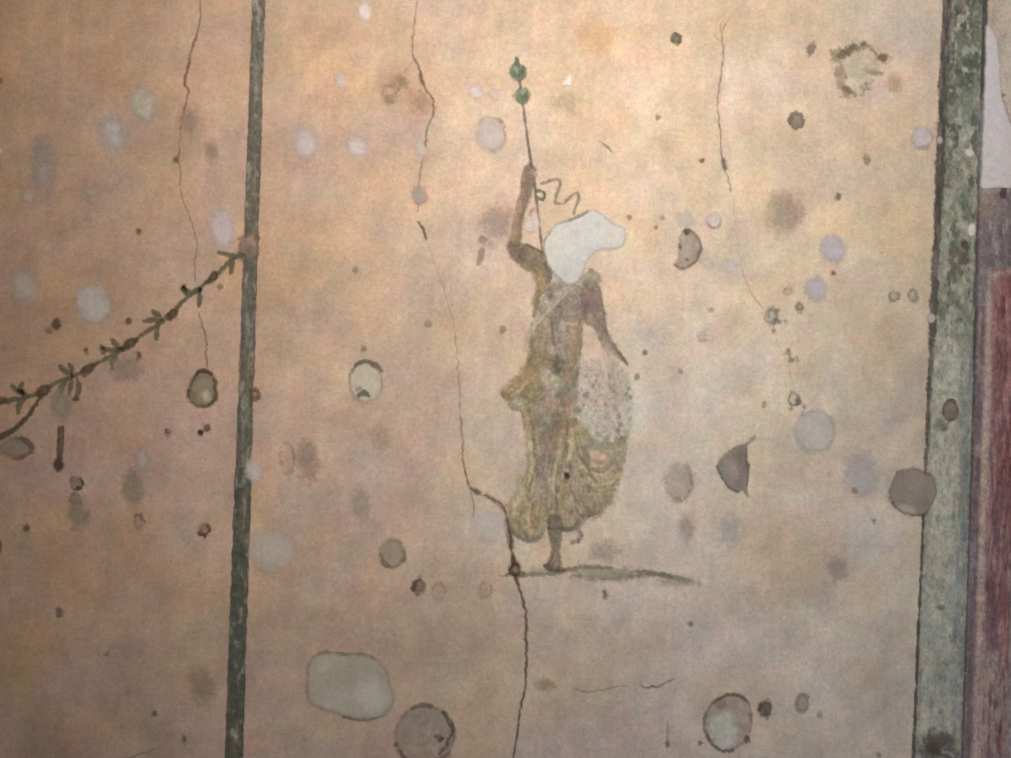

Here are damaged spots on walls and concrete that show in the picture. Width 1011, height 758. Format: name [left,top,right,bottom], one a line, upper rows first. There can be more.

crack [184,33,197,92]
damp [831,42,899,97]
crack [465,470,528,755]